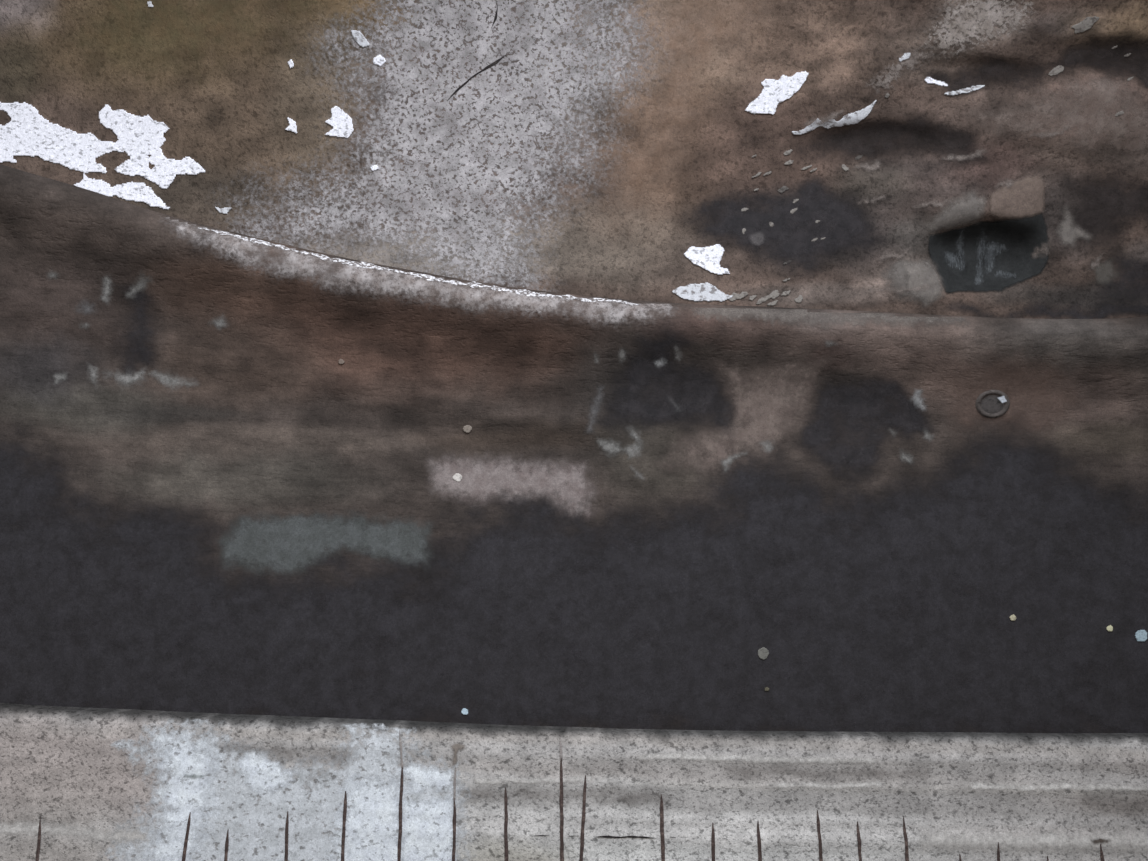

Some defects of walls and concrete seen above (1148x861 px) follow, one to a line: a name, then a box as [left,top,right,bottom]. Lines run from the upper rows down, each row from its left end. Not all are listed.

peeling [745,71,808,115]
peeling [792,0,1028,135]
peeling [0,102,205,209]
peeling [784,149,817,172]
peeling [672,244,803,306]
flaking render [903,261,942,304]
leakage [588,388,639,457]
crack [598,833,676,841]